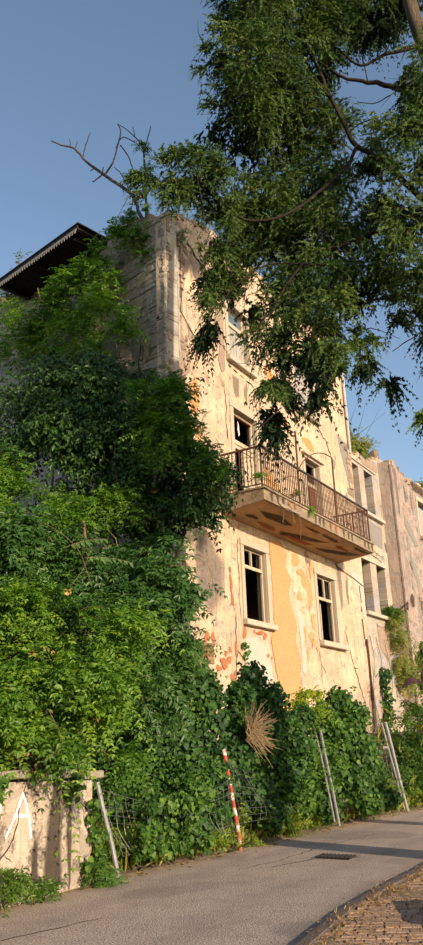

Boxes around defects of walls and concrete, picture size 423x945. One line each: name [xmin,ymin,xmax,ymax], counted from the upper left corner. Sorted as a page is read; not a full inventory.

leakage [245,492,373,563]
leakage [337,567,349,606]
flaking render [216,538,319,711]